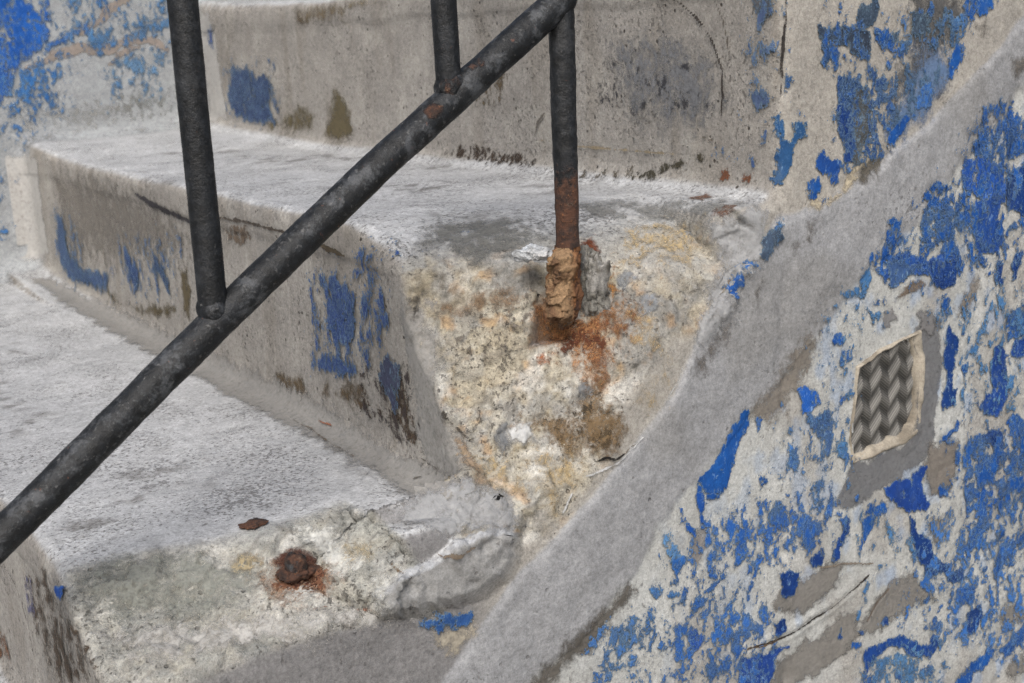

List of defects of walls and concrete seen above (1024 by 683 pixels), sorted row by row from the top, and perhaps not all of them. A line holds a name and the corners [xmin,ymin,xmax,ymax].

peeling [0,0,171,152]
peeling [220,50,281,129]
peeling [736,0,808,188]
peeling [805,0,999,205]
peeling [51,207,184,308]
spalling [304,208,785,551]
corrosion [533,239,640,392]
flaking render [581,96,1024,683]
spalling [54,501,475,683]
corrosion [258,548,332,602]
crack [747,562,889,650]